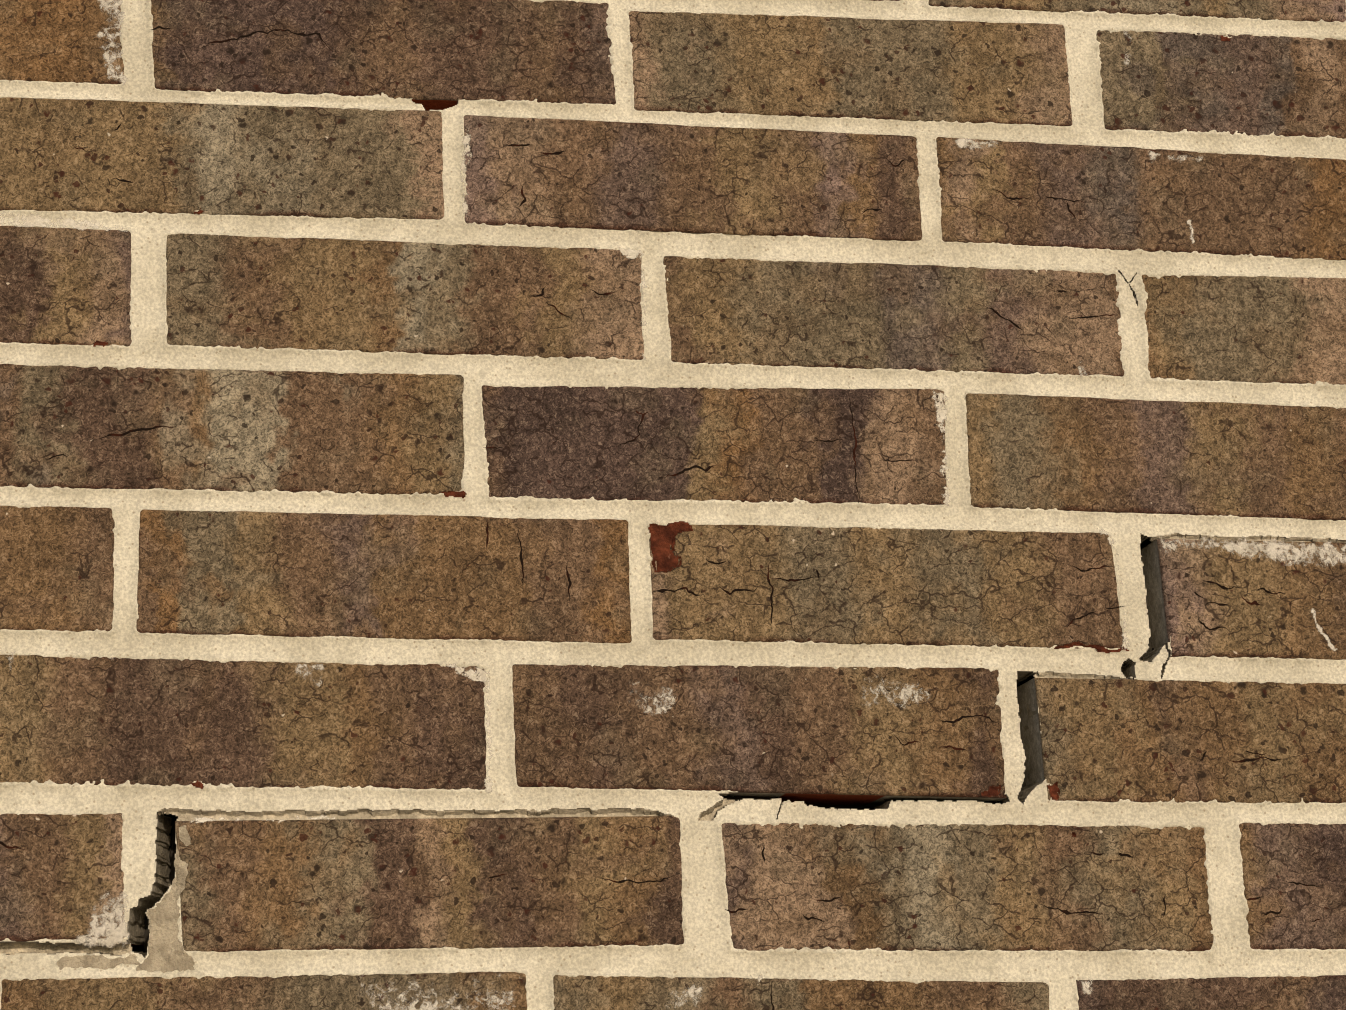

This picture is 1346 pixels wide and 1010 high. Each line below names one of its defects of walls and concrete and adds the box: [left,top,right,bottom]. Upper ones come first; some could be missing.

damp [98,0,126,85]
crack [1140,533,1346,544]
damp [1161,537,1346,566]
crack [0,642,1171,958]
damp [361,982,512,1010]